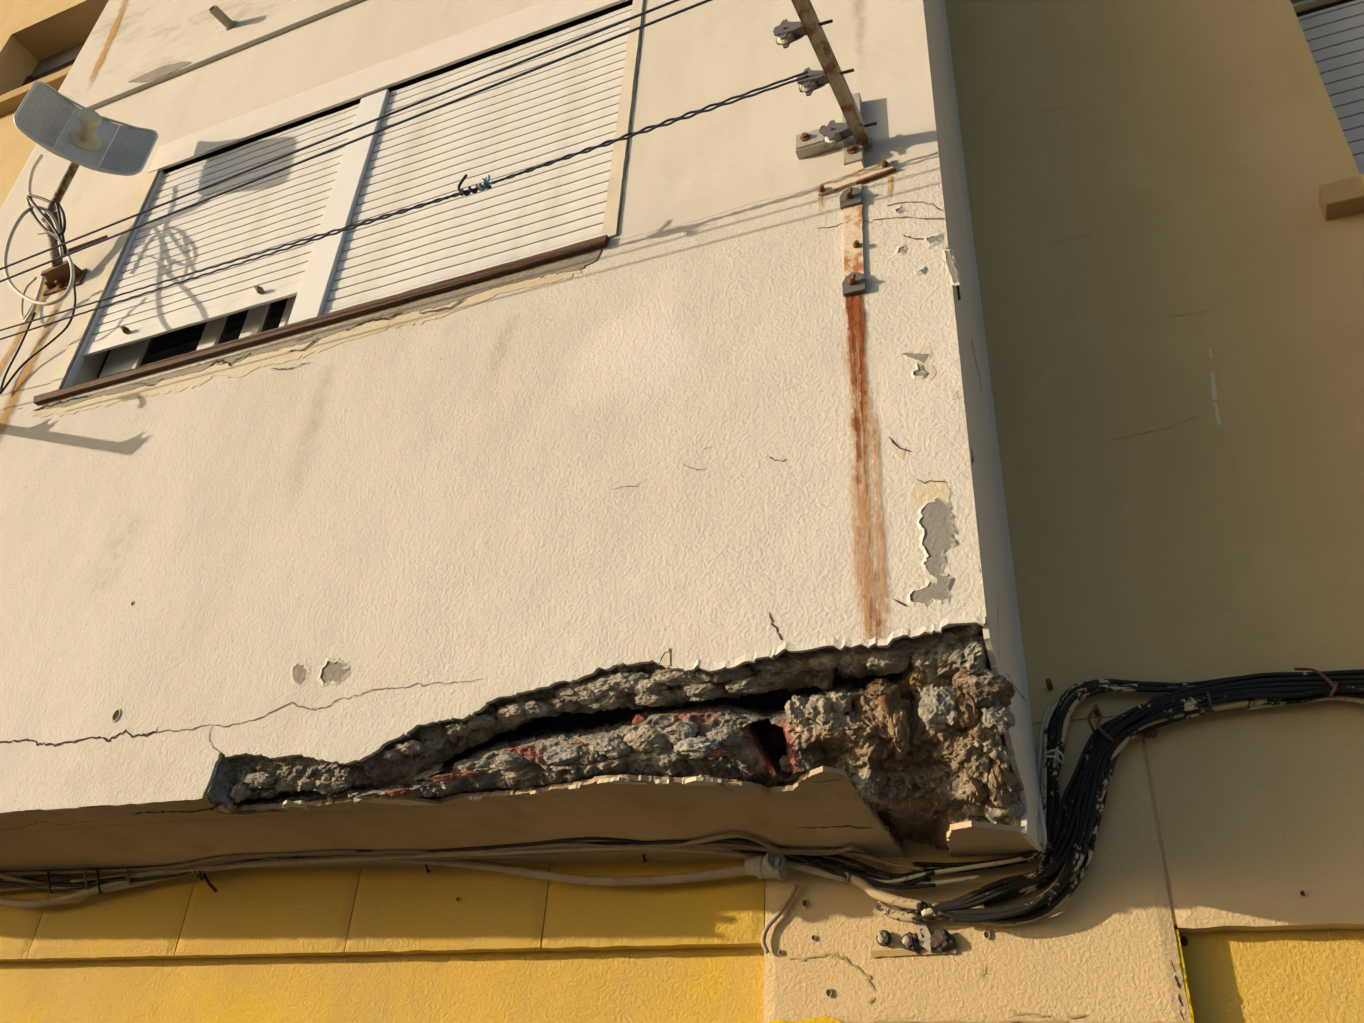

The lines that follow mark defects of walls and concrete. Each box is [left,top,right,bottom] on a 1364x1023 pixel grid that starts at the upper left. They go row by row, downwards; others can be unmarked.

corrosion [0,284,65,435]
flaking render [32,248,602,417]
spalling [893,232,961,301]
corrosion [845,293,887,638]
crack [0,678,485,751]
spalling [206,479,1027,849]